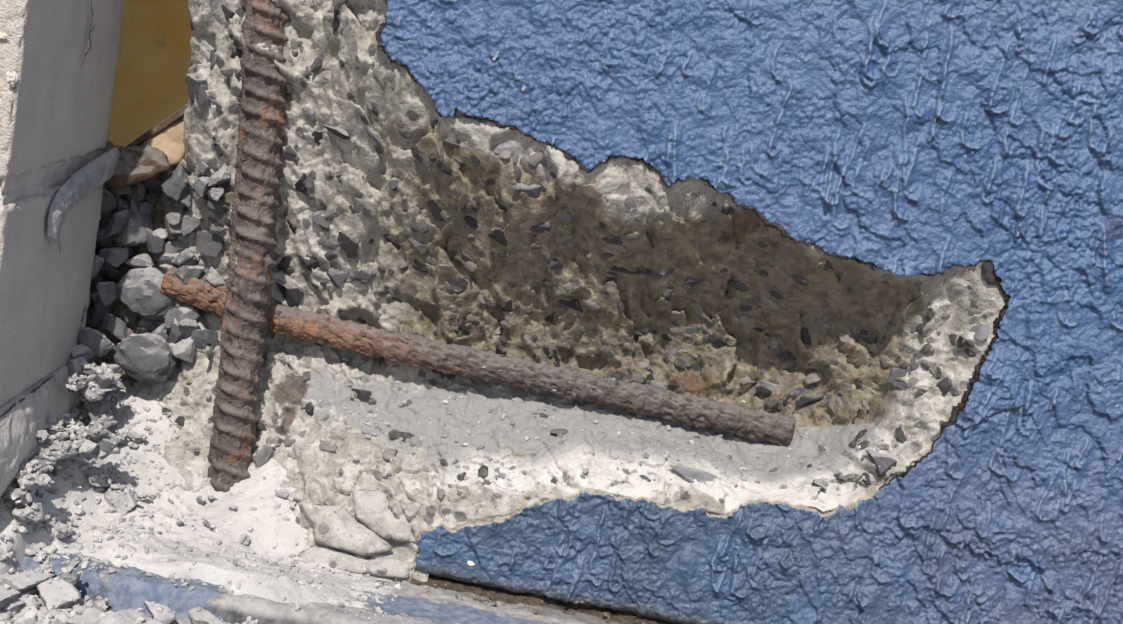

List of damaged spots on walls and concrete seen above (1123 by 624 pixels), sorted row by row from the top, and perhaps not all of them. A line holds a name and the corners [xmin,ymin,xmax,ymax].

spalling [99,188,127,226]
spalling [85,243,223,492]
rust [273,373,308,433]
spalling [141,0,1010,624]